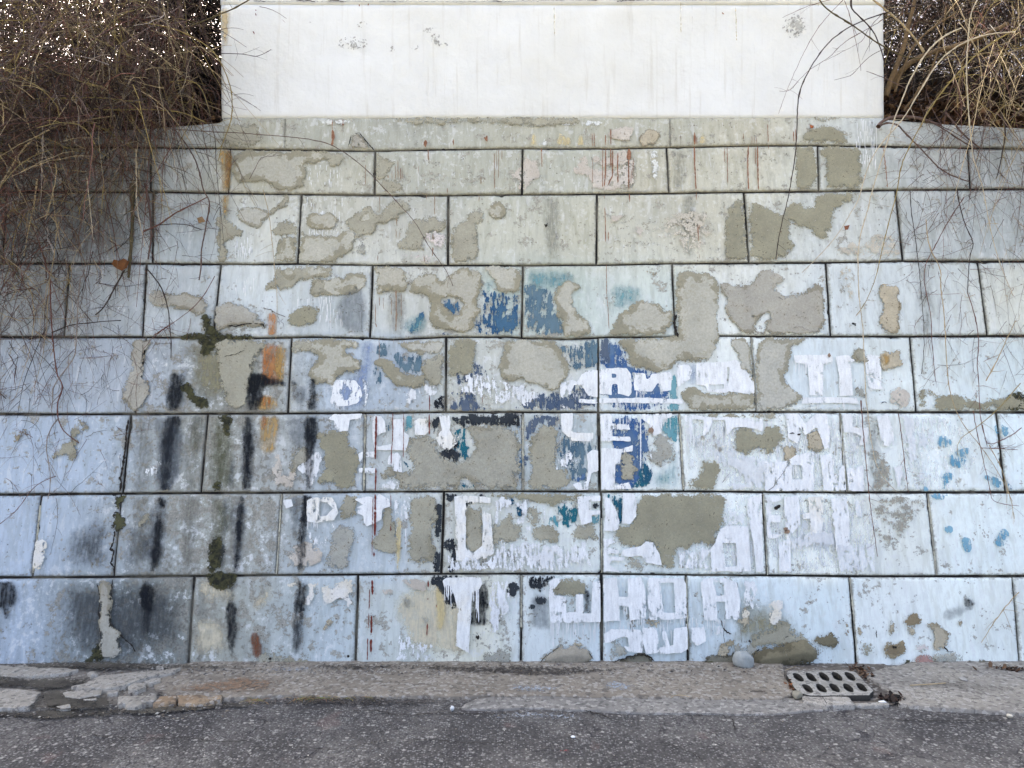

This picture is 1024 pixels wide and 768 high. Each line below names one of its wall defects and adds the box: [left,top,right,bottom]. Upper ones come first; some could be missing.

spalling [397,217,447,263]
corrosion [592,129,634,241]
spalling [371,423,599,564]